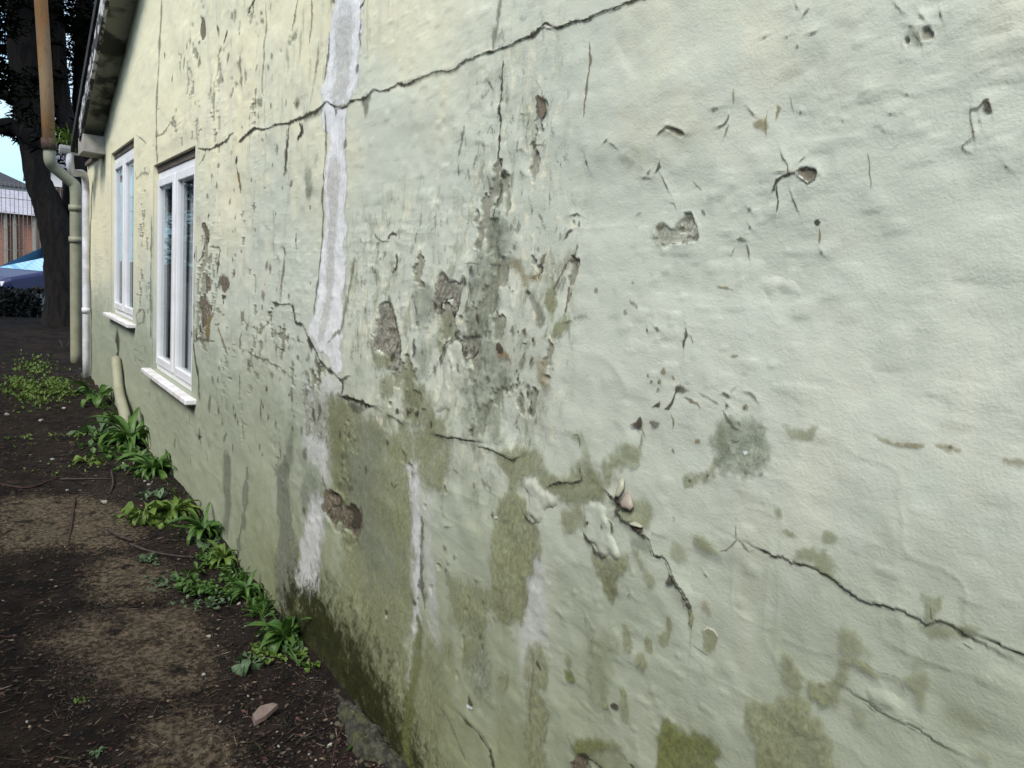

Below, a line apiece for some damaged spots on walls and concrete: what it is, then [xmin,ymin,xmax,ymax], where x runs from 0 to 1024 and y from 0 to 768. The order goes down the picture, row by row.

crack [198,0,637,220]
peeling [772,155,816,212]
peeling [191,223,230,408]
crack [239,246,403,425]
spalling [370,295,422,370]
crack [631,385,717,447]
damp [274,457,324,611]
spalling [301,473,363,540]
damp [306,367,448,683]
damp [489,444,651,623]
crack [608,495,694,625]
damp [522,645,549,768]